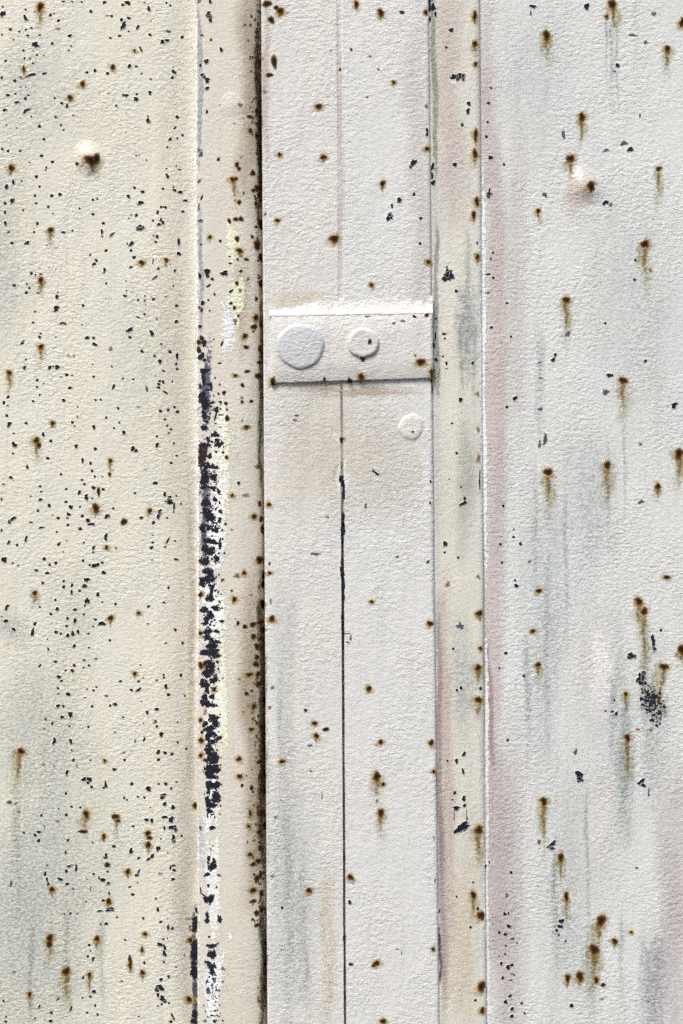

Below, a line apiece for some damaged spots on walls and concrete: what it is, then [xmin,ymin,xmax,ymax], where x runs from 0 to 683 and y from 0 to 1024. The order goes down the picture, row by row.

peeling [0,6,54,141]
rust [80,153,100,173]
rust [577,112,588,140]
peeling [196,240,242,830]
peeling [0,443,126,789]
rust [634,597,648,661]
peeling [626,651,666,727]
peeling [123,781,183,896]
rust [219,556,277,1024]
rust [538,797,550,837]
peeling [200,845,224,1023]
rust [564,915,618,1000]